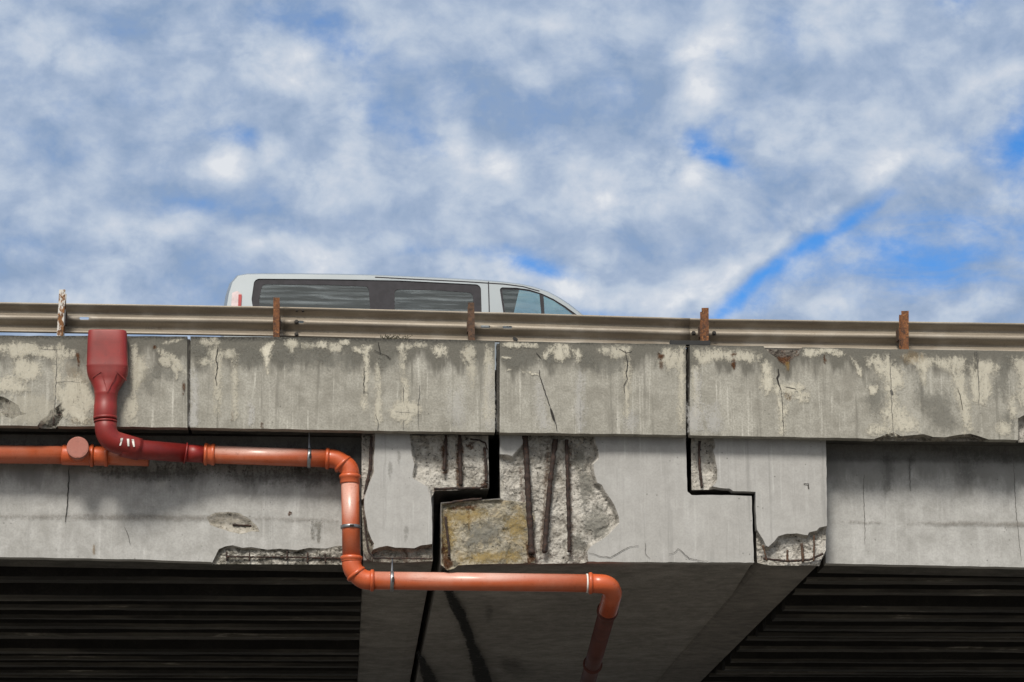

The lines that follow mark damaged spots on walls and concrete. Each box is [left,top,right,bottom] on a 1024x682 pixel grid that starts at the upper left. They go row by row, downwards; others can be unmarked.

water stain [0,341,94,425]
water stain [124,345,150,423]
water stain [158,339,186,379]
water stain [200,338,239,419]
water stain [260,340,447,425]
water stain [461,342,581,426]
crack [537,354,581,431]
water stain [661,347,810,435]
water stain [803,348,1024,436]
spalling [207,512,342,565]
spalling [360,434,619,570]
spalling [756,526,827,566]